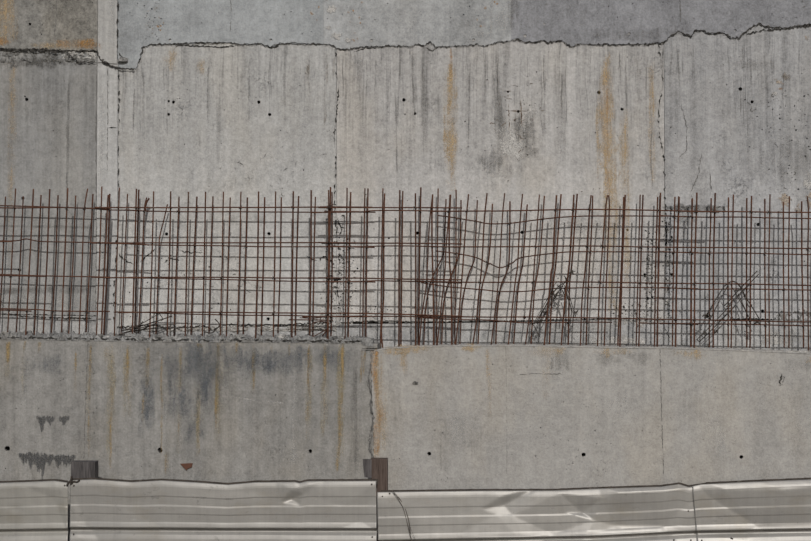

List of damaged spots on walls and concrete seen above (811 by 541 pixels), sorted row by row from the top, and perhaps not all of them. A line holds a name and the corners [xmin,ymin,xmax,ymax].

crack [0,73,378,458]
crack [0,0,811,269]
spalling [0,172,811,353]
crack [375,77,712,474]